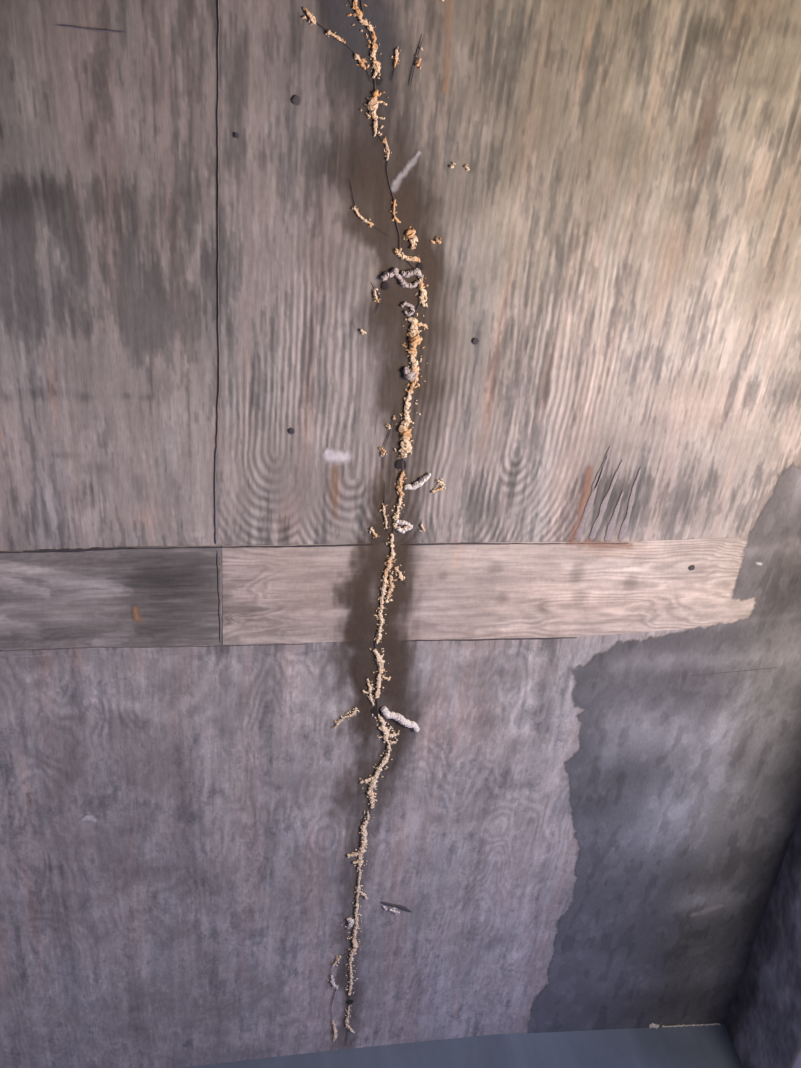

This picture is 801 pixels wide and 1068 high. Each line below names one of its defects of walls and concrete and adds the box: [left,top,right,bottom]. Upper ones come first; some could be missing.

crack [316,0,425,91]
crack [350,119,424,271]
crack [373,282,389,314]
crack [383,384,417,534]
peeling [574,446,641,542]
crack [333,604,388,760]
crack [330,952,354,1043]